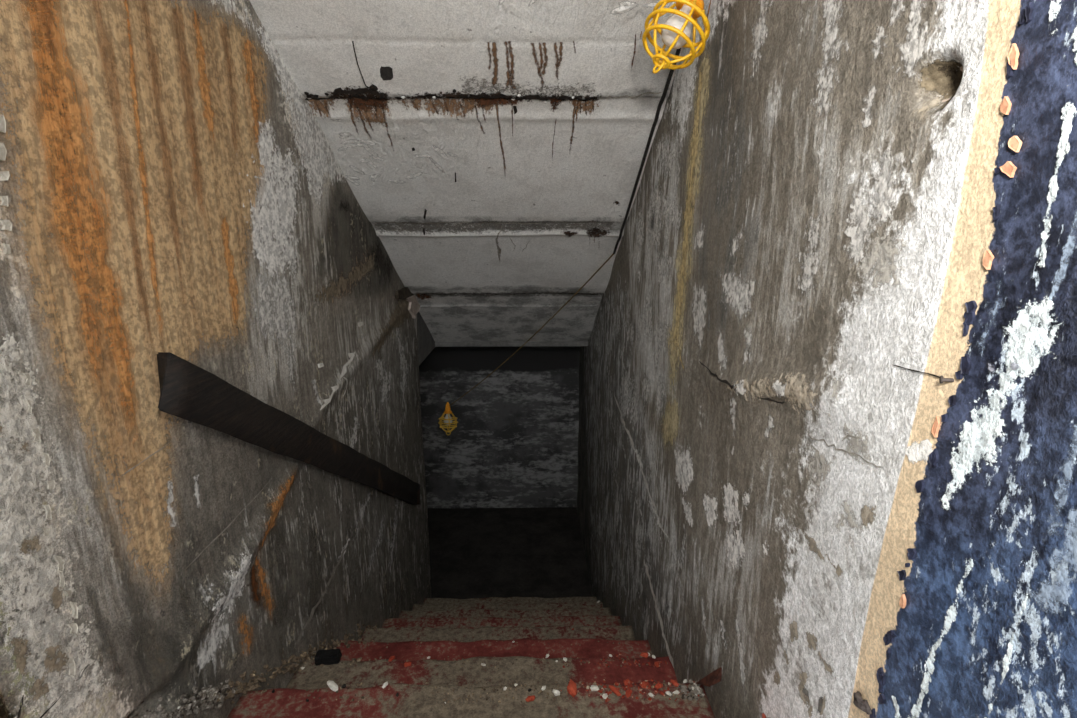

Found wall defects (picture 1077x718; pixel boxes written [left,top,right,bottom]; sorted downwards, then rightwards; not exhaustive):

rust [487,41,516,89]
rust [531,41,576,86]
spalling [913,59,963,121]
peeling [994,136,1022,178]
peeling [1006,43,1019,78]
peeling [1049,0,1064,34]
peeling [1037,102,1077,267]
rust [0,0,267,581]
peeling [905,215,1077,509]
peeling [0,332,109,718]
rust [250,474,296,612]
peeling [985,426,1077,718]